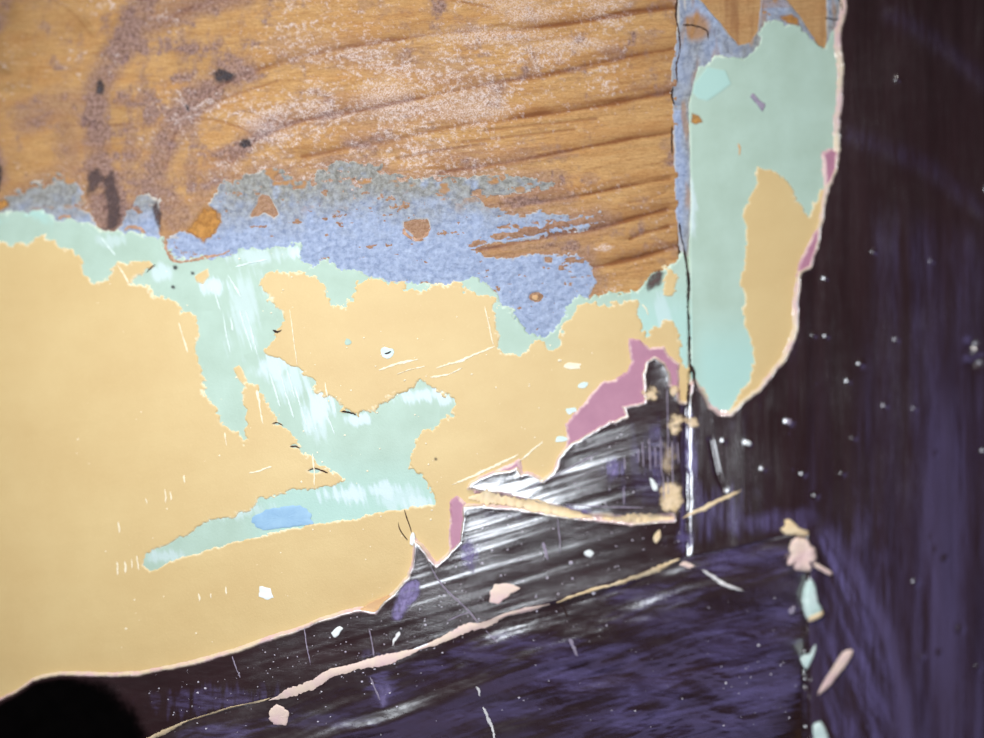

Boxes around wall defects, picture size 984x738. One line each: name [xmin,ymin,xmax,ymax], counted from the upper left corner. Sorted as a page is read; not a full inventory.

crack [671,0,709,154]
peeling [671,0,840,411]
peeling [0,0,692,697]
crack [679,223,698,419]
peeling [602,490,741,523]